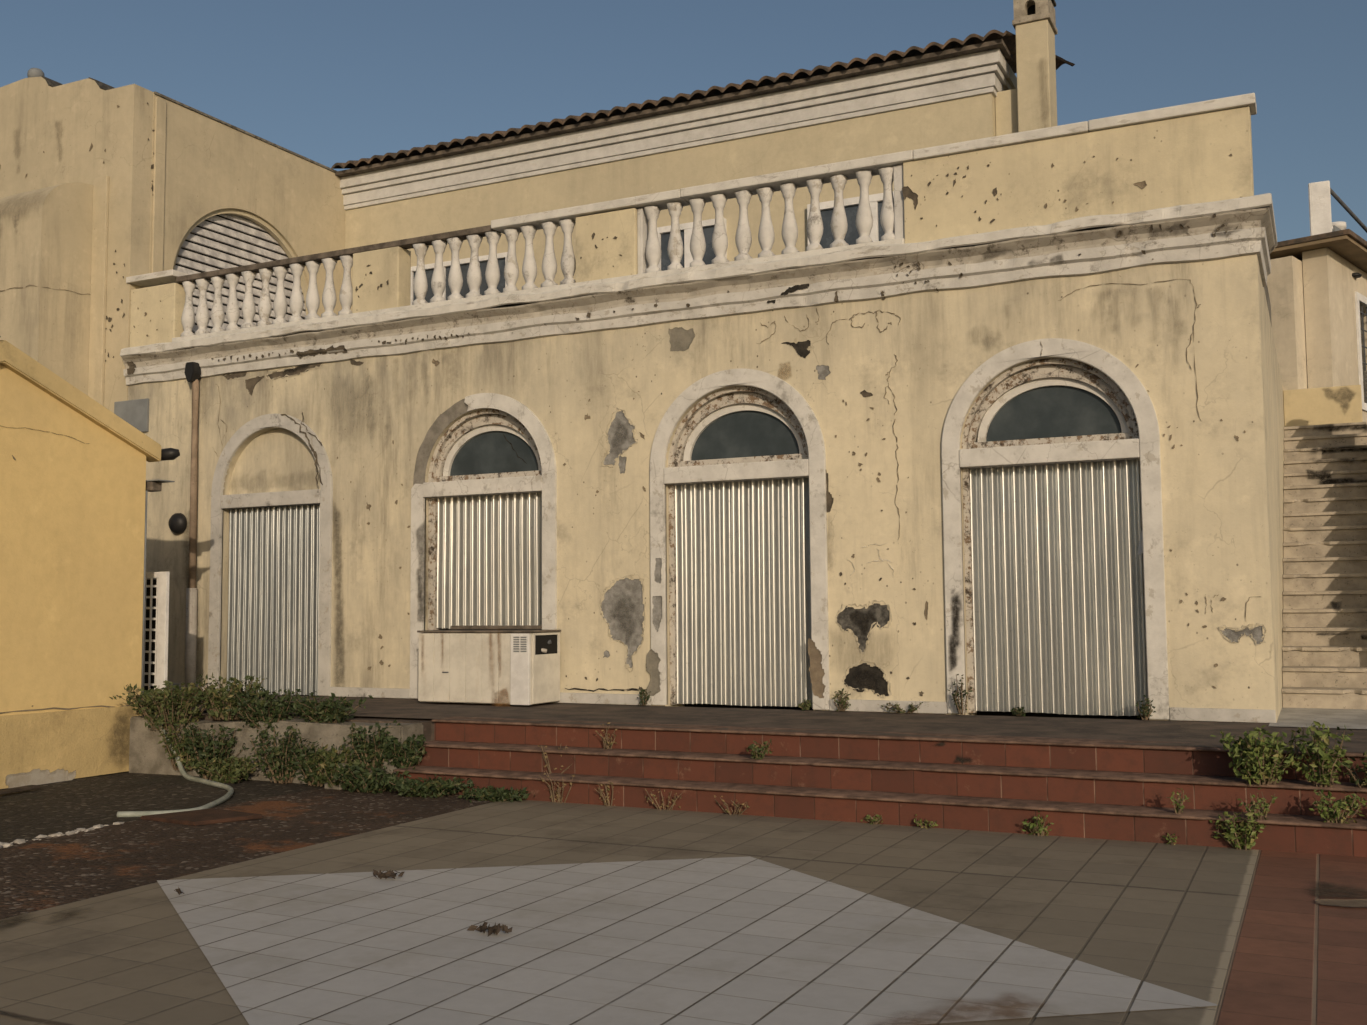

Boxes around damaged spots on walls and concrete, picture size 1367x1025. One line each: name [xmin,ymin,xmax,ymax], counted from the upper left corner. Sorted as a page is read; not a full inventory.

flaking render [668,327,695,351]
crack [1,426,90,444]
peeling [601,391,645,473]
crack [761,308,901,579]
peeling [599,558,662,696]
peeling [808,638,826,698]
flaking render [835,600,923,698]
peeling [1180,593,1267,645]